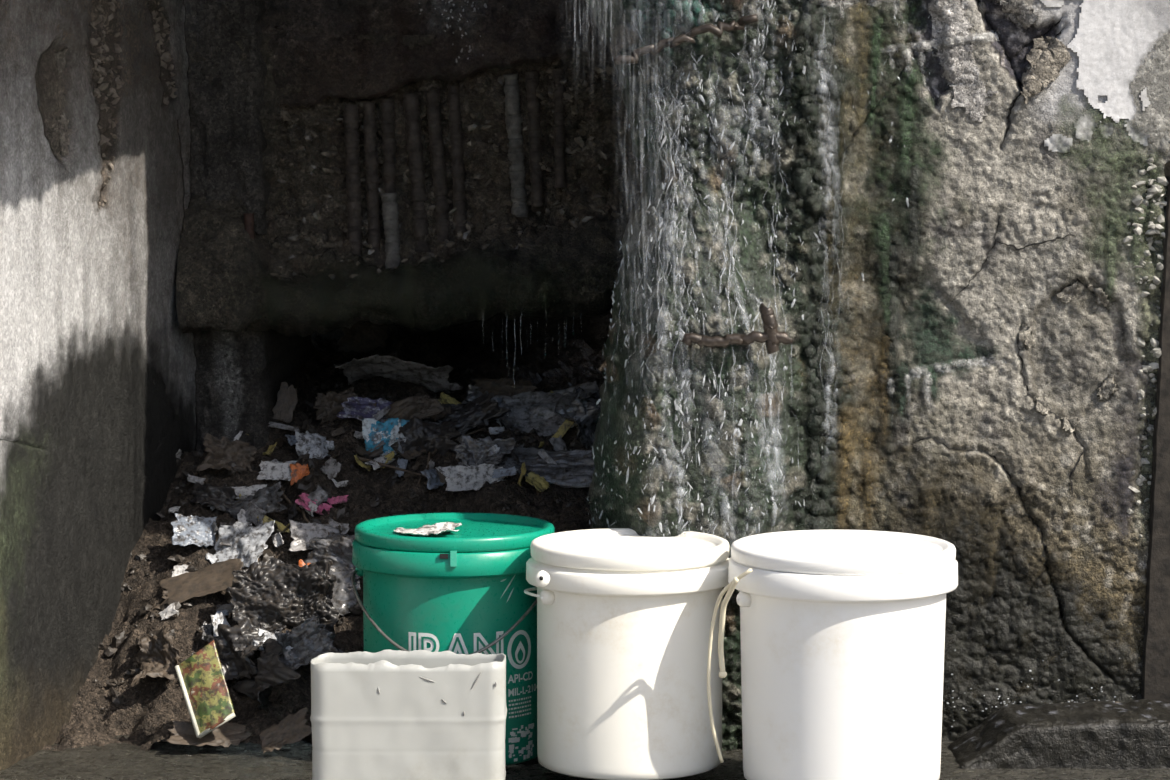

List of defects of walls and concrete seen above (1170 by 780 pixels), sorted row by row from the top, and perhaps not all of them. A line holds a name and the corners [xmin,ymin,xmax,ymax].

spalling [90,0,125,208]
spalling [269,61,628,280]
leakage [636,0,677,60]
leakage [691,0,702,43]
crack [978,0,1064,148]
rust [681,302,794,354]
peeling [905,0,1170,521]
crack [1017,324,1087,499]
leakage [0,328,198,771]
crack [913,437,1061,611]